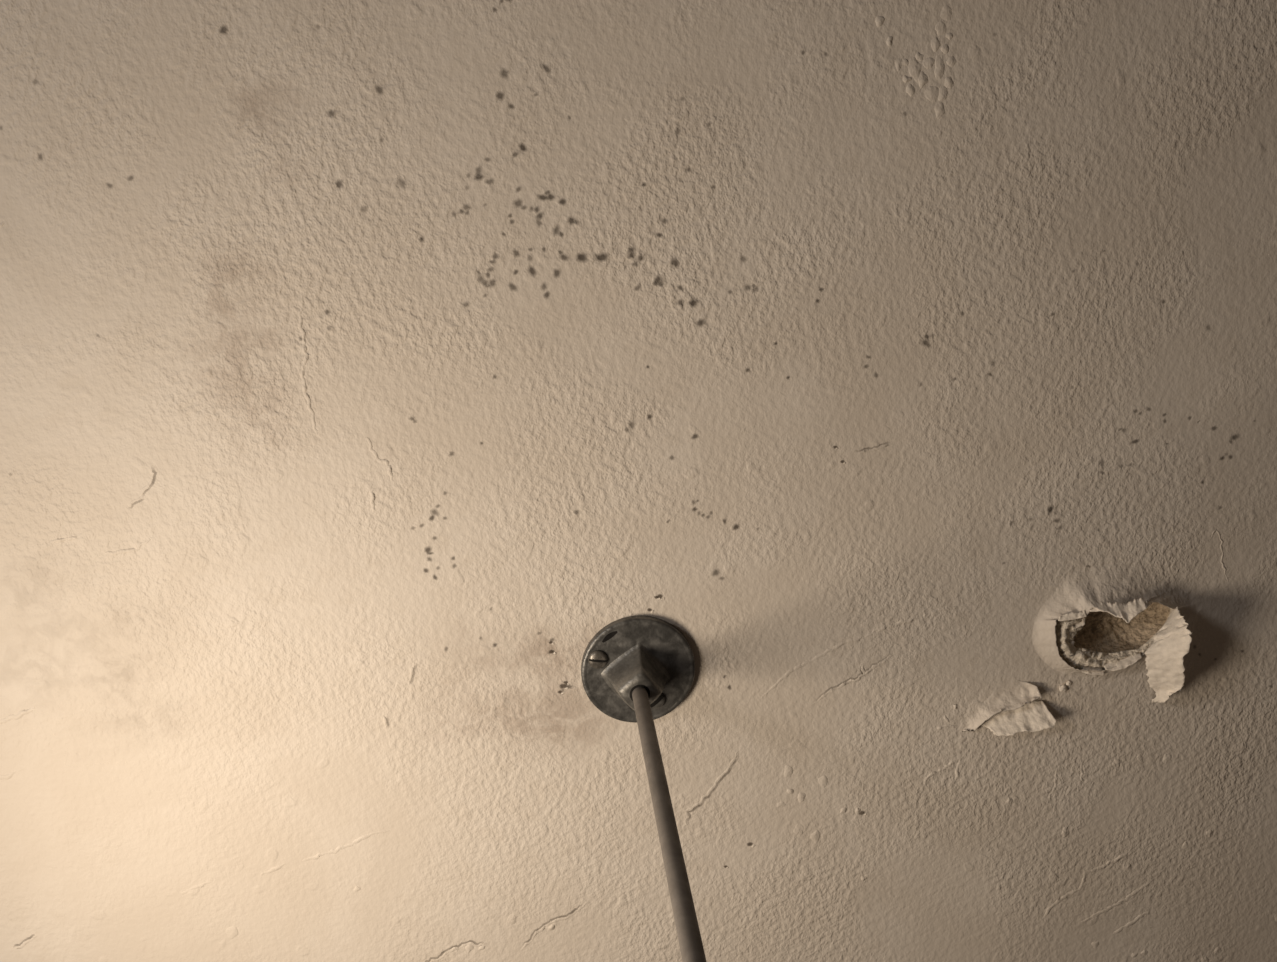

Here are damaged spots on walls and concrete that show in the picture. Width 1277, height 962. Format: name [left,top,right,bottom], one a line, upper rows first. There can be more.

spalling [1032,563,1196,703]
peeling [960,680,1056,736]